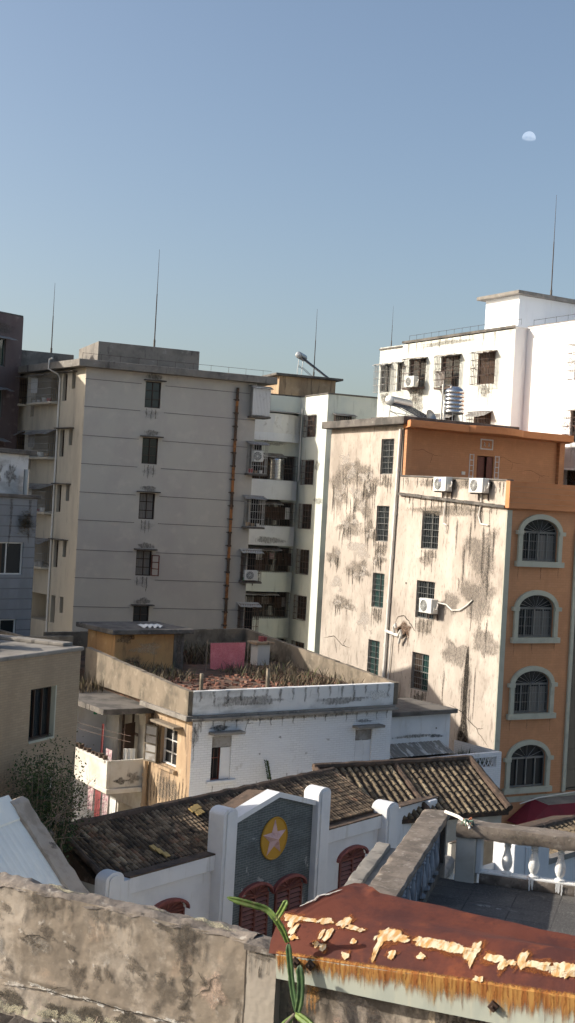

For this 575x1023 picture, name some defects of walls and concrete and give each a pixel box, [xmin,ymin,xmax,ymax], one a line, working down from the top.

leakage [327,462,391,584]
leakage [333,595,355,614]
leakage [396,615,432,647]
leakage [403,478,498,743]
leakage [157,923,207,964]
leakage [234,950,268,1023]
rust [269,873,575,1022]
peeling [280,889,575,983]